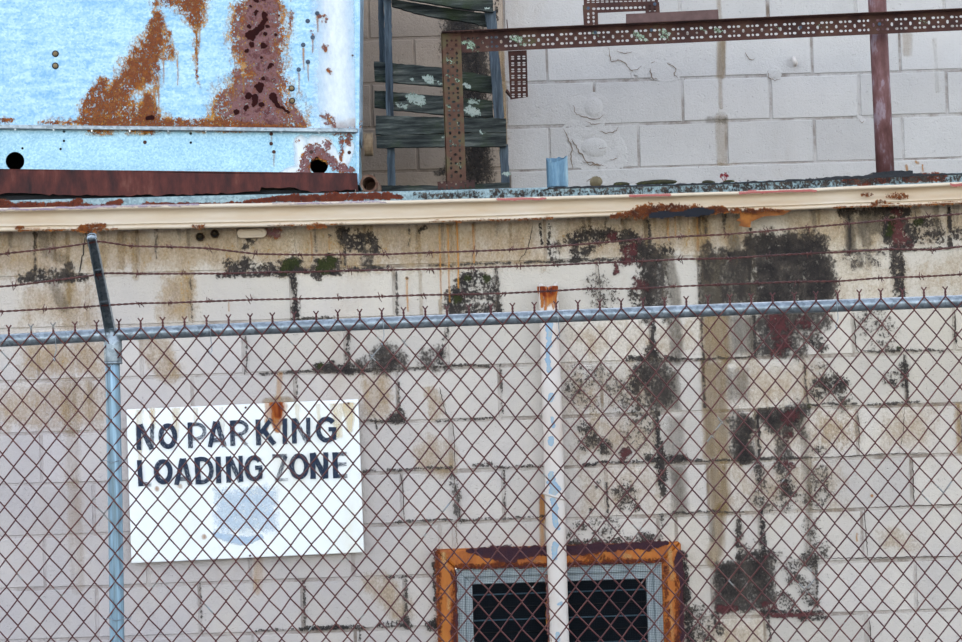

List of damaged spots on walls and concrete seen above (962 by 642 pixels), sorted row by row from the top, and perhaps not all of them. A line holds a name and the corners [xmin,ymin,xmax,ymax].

rust [610,202,784,240]
leakage [0,206,962,321]
leakage [259,327,504,430]
leakage [363,465,453,473]
leakage [395,461,543,524]
leakage [562,310,944,642]
leakage [255,575,413,641]
leakage [425,557,437,631]
rust [568,553,681,642]